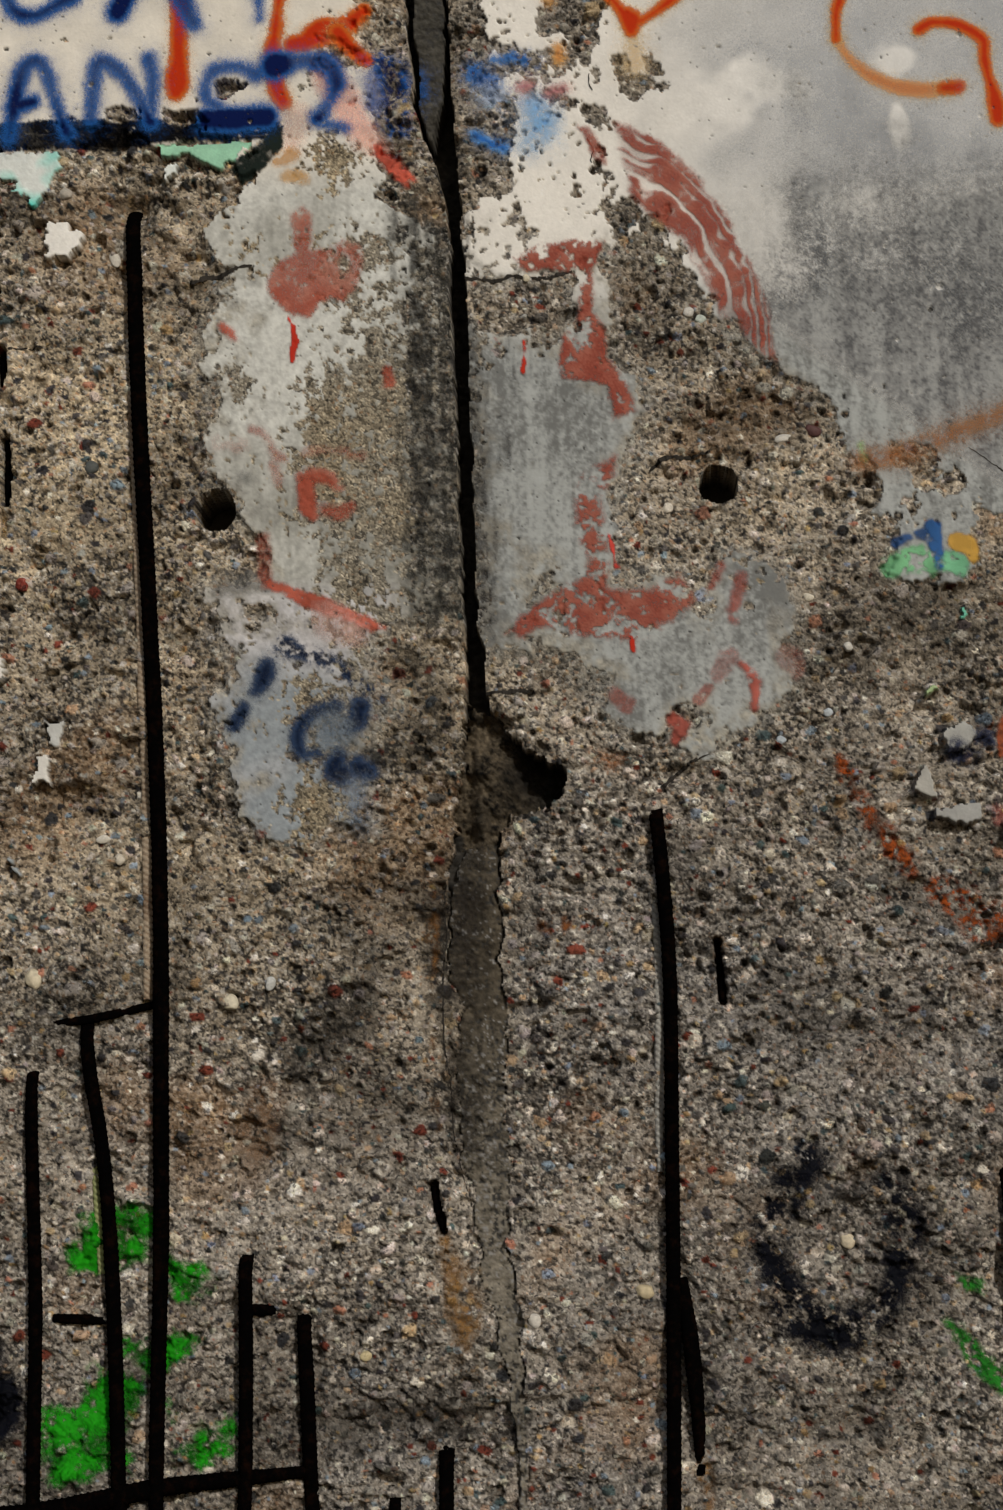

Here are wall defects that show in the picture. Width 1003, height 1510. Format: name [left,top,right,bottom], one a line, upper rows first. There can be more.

spalling [610,52,671,102]
peeling [296,130,375,198]
spalling [446,0,617,378]
peeling [344,231,405,274]
crack [465,270,573,283]
crack [486,687,535,695]
rust [836,754,1003,943]
crack [441,891,474,1211]
spalling [94,1009,154,1219]
spalling [117,1226,153,1484]
spalling [163,1487,238,1510]
spalling [251,1478,305,1510]